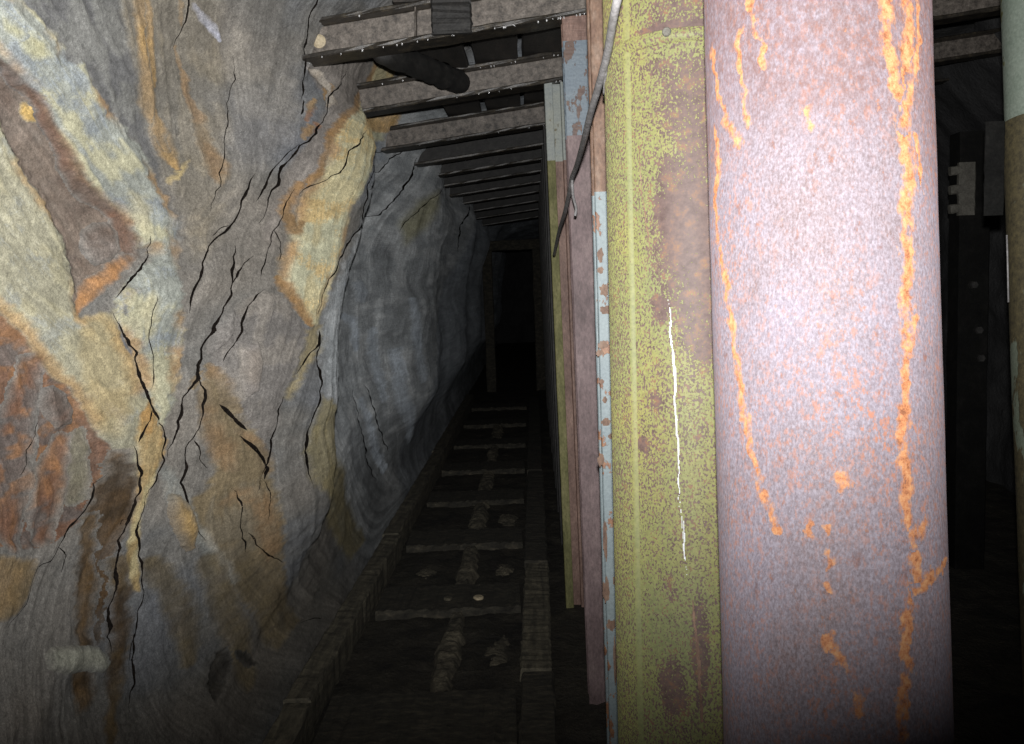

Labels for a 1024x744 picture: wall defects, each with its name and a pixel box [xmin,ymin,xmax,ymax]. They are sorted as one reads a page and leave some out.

rust [596,248,609,314]
rust [709,0,784,536]
crack [106,0,445,713]
rust [874,0,948,744]
rust [830,464,856,495]
rust [802,517,839,597]
rust [818,627,872,720]